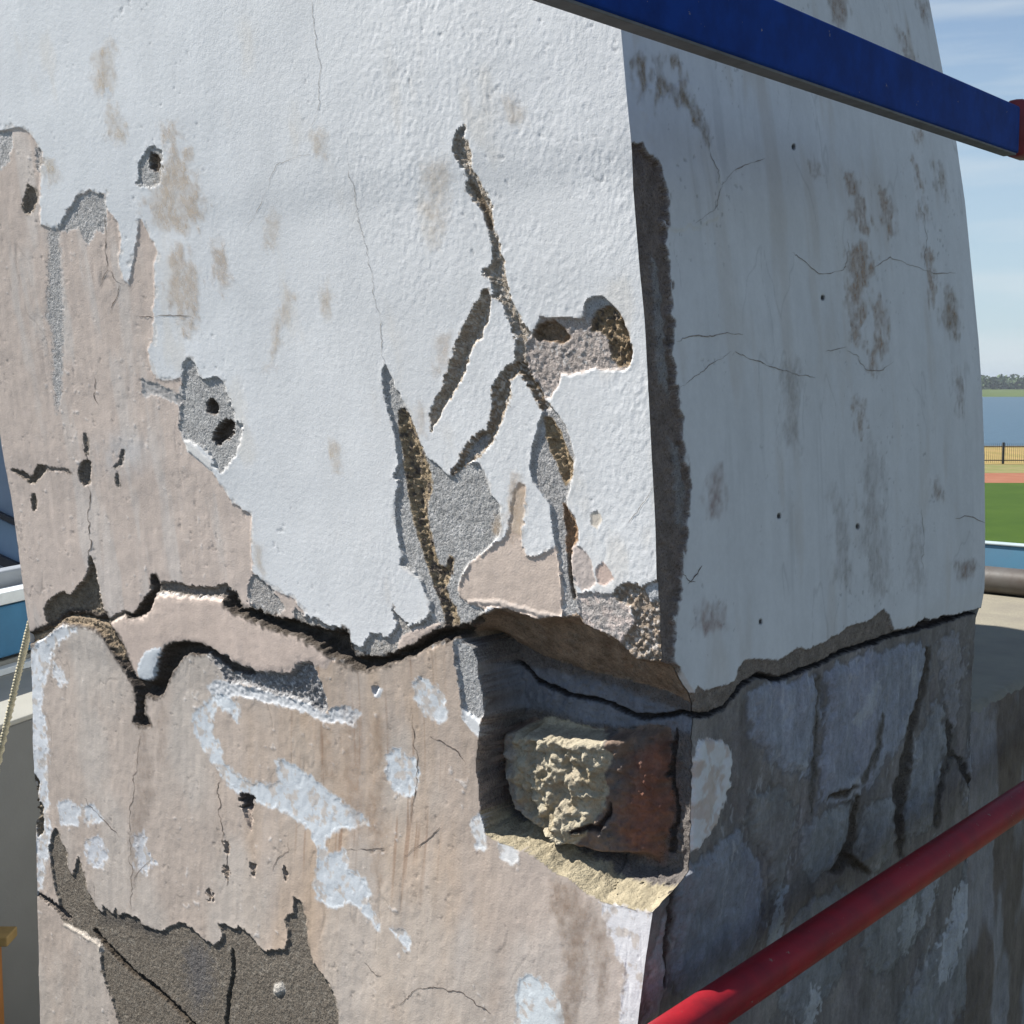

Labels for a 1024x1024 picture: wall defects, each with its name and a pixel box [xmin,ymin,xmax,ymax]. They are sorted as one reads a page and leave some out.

crack [795,243,849,274]
crack [666,332,815,396]
crack [30,123,579,904]
peeling [0,126,342,1024]
spalling [452,141,981,1024]
spalling [351,603,445,657]
water stain [242,805,254,831]